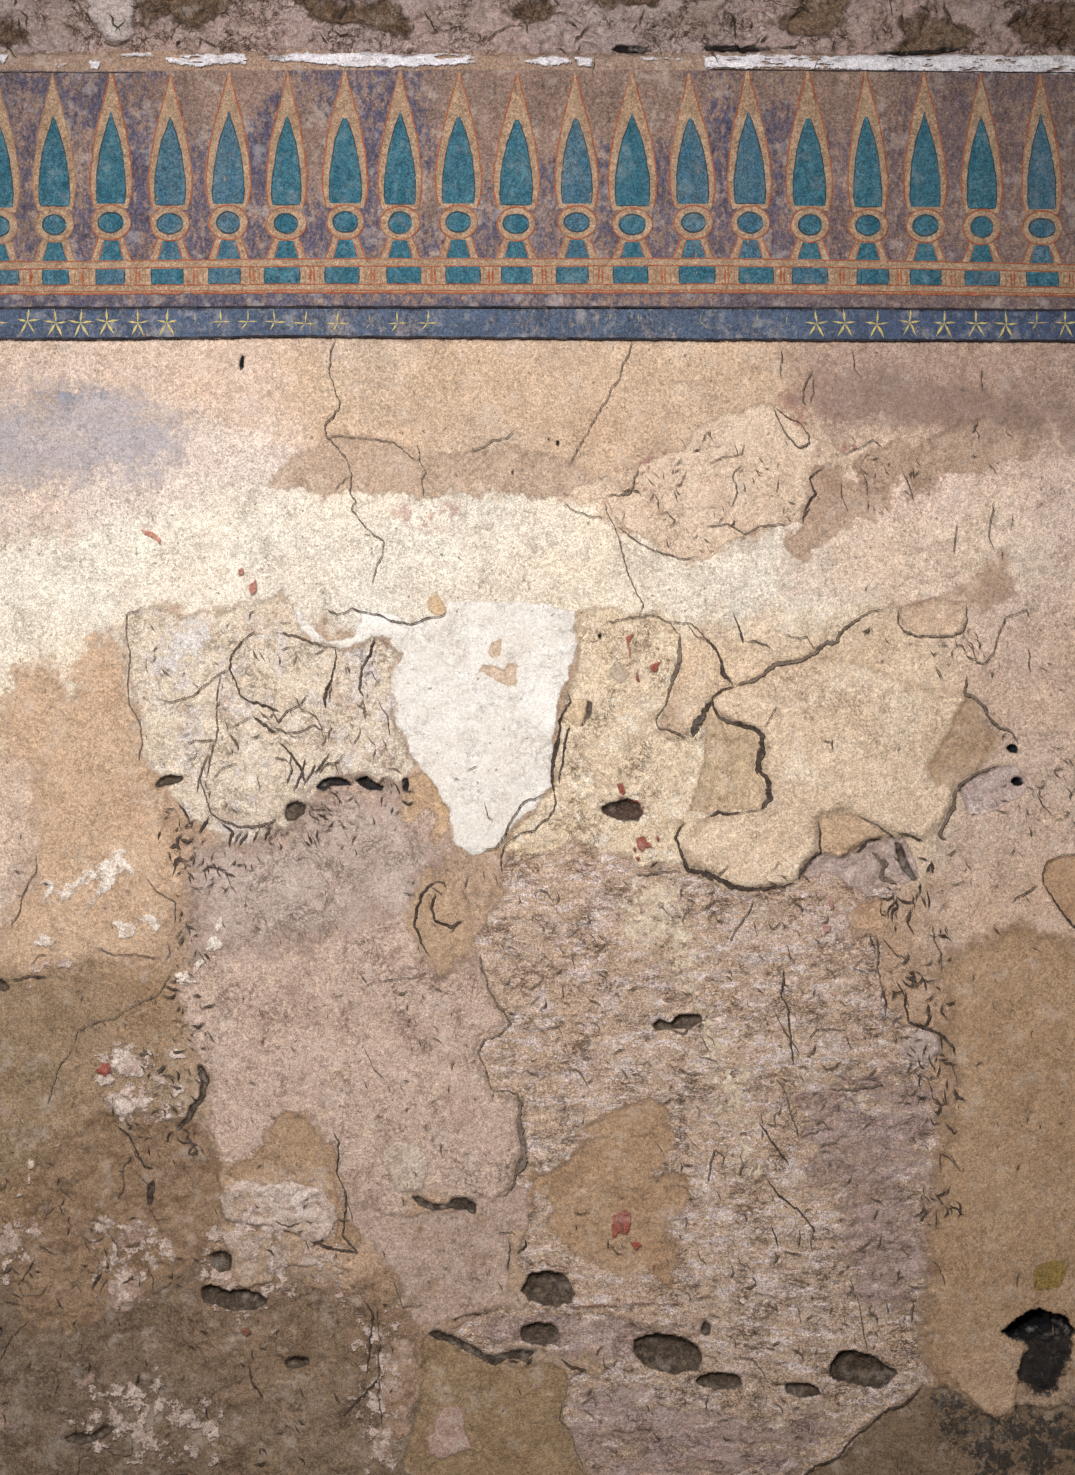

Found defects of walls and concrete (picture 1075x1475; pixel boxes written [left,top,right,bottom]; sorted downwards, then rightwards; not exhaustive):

peeling [94,1067,185,1123]
spalling [112,588,1029,1475]
crack [500,342,1075,1475]